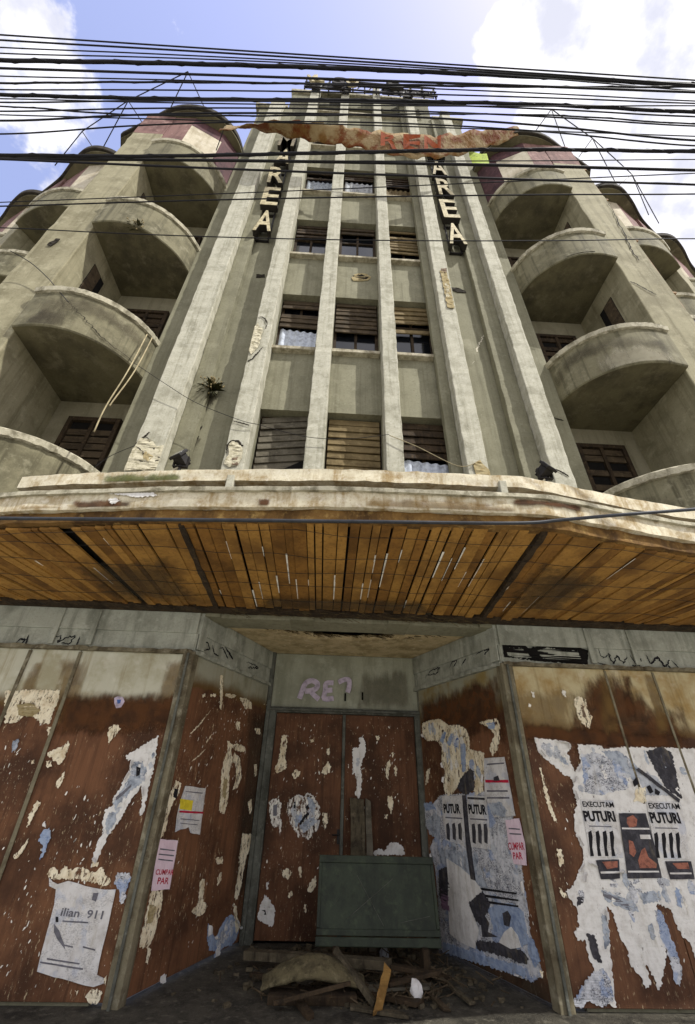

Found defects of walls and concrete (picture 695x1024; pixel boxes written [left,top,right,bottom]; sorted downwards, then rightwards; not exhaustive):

flaking render [249,323,263,354]
flaking render [124,438,164,471]
flaking render [224,440,243,467]
rust [514,499,581,511]
peeling [4,689,60,735]